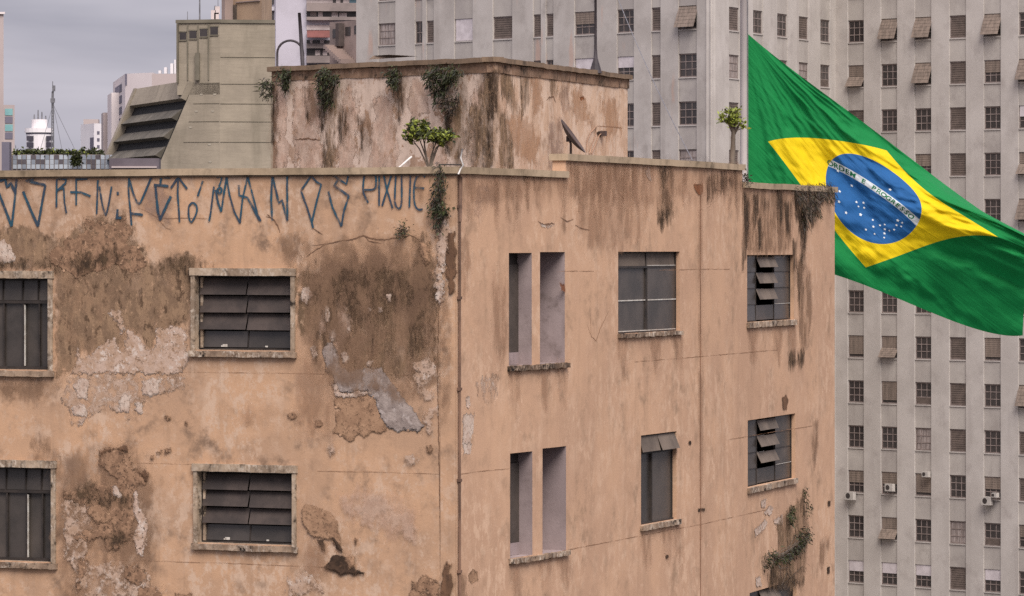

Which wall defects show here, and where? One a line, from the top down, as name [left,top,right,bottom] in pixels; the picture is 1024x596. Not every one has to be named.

water stain [304,81,347,168]
water stain [445,72,555,182]
water stain [0,214,202,377]
flaking render [60,309,190,427]
crack [306,228,421,257]
water stain [295,234,445,399]
spalling [301,264,440,454]
peeling [413,214,452,305]
water stain [707,170,822,366]
peeling [60,445,192,596]
spalling [301,504,365,576]